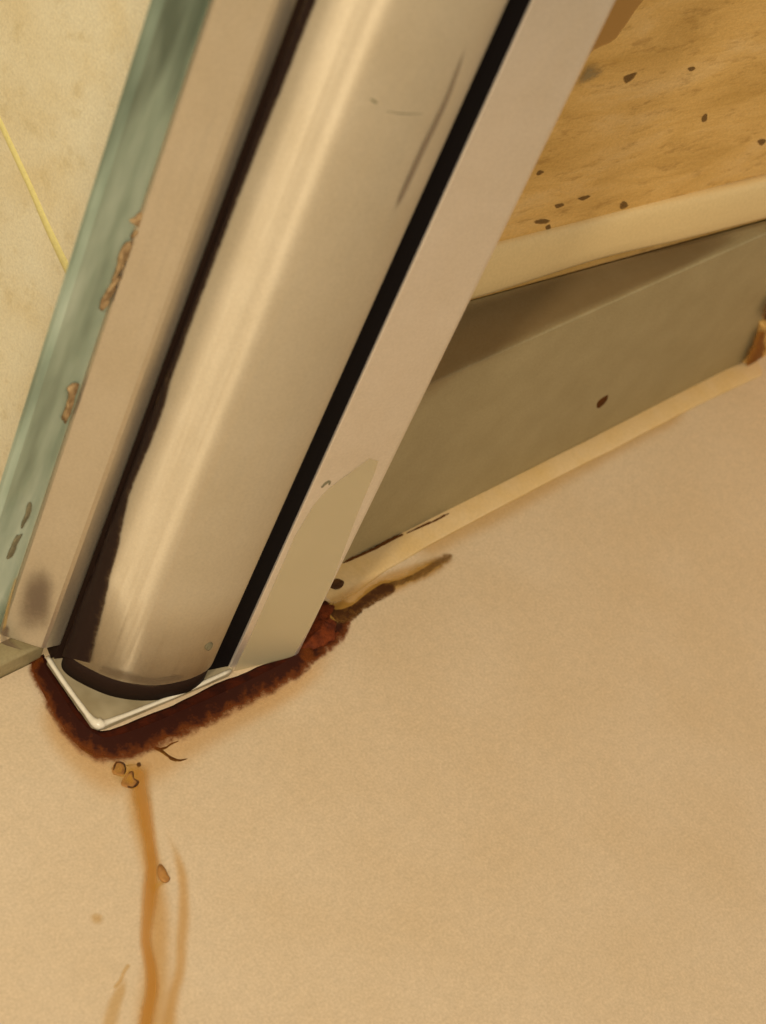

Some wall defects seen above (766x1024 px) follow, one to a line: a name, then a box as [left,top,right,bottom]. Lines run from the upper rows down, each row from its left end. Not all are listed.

rust [29,554,452,1024]